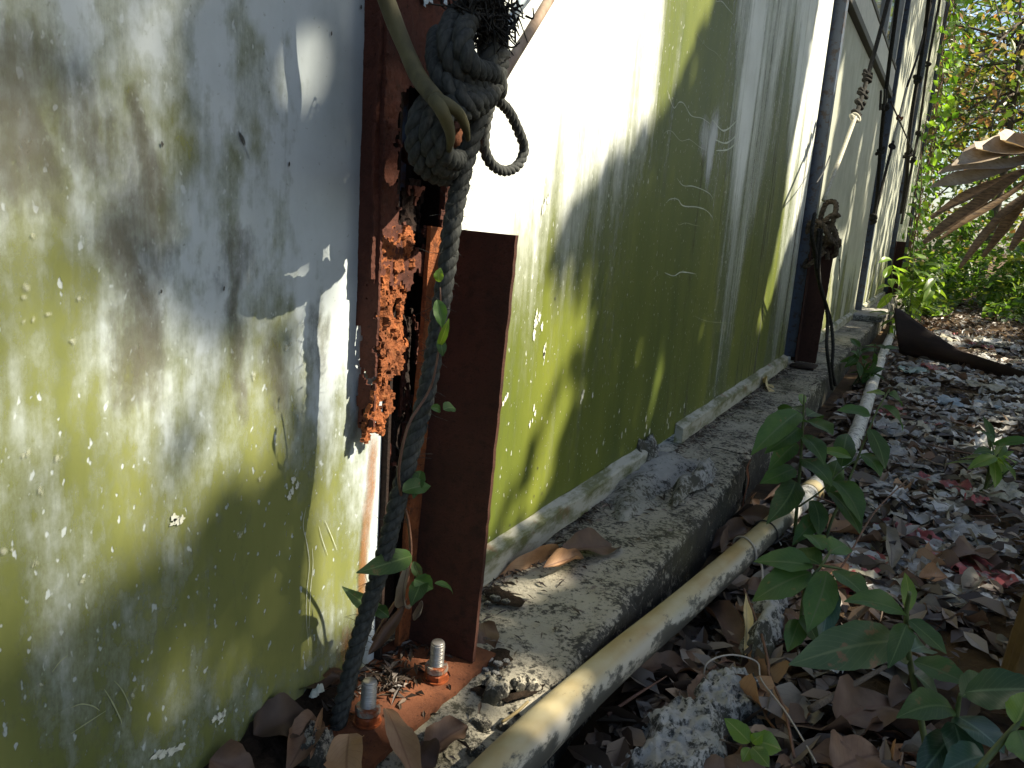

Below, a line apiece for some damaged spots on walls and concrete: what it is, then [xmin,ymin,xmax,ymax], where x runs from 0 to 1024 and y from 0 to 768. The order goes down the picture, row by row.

corrosion [396,0,456,76]
leakage [0,44,58,191]
leakage [132,98,164,213]
corrosion [438,186,450,228]
leakage [106,213,162,384]
corrosion [359,2,426,593]
peeling [170,513,185,526]